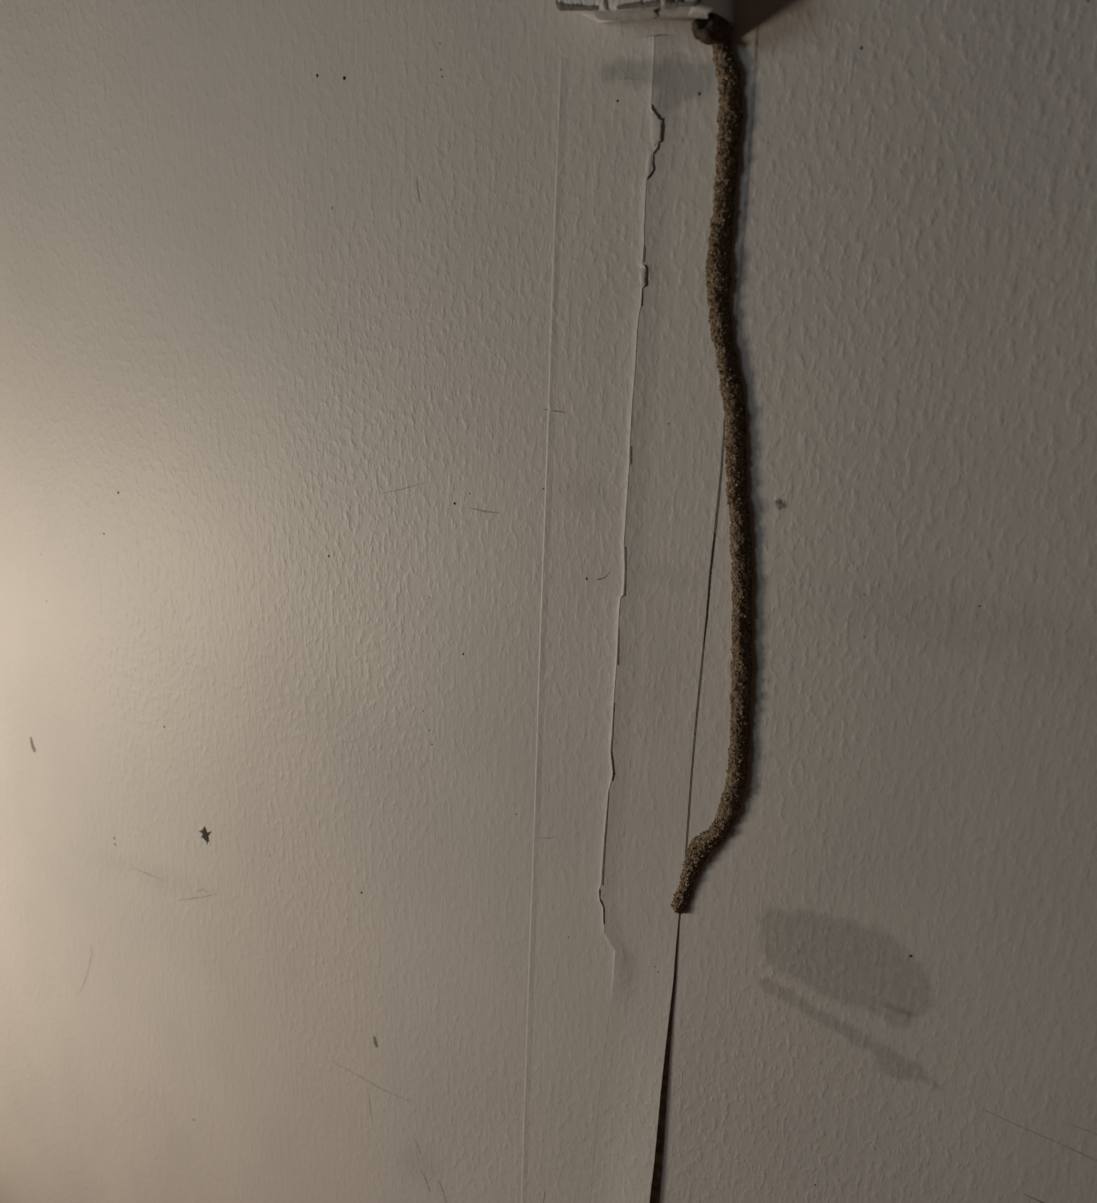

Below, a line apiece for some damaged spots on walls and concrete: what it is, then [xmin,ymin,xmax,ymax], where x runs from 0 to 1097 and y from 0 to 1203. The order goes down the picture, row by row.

crack [729,20,759,331]
crack [568,36,664,1203]
crack [685,425,725,859]